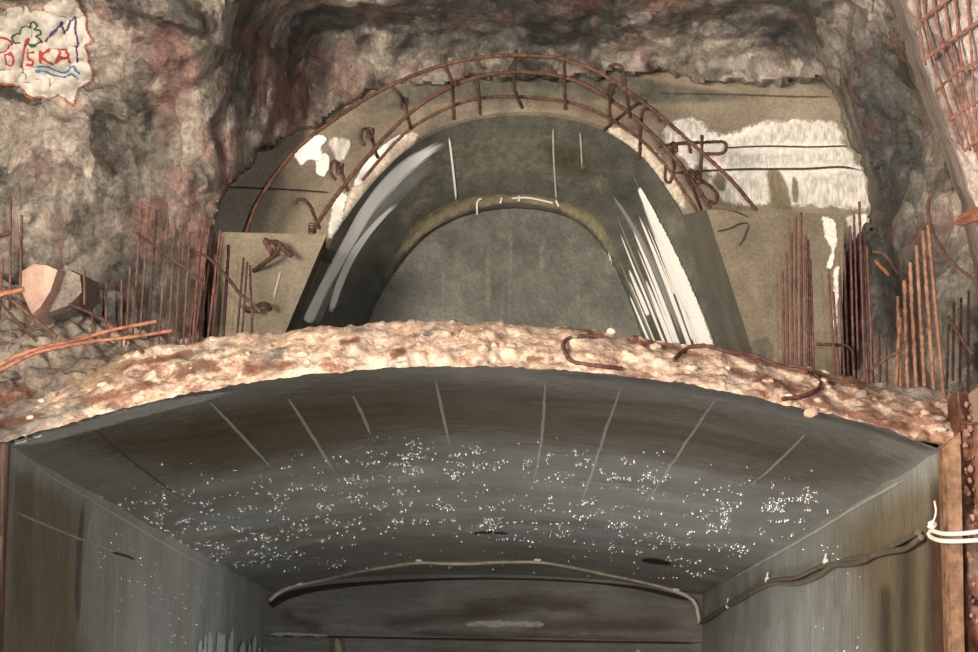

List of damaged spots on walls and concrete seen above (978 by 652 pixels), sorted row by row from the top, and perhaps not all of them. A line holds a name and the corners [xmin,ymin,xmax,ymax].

leakage [304,131,606,323]
spalling [0,49,975,445]
leakage [714,172,725,190]
leakage [767,170,798,209]